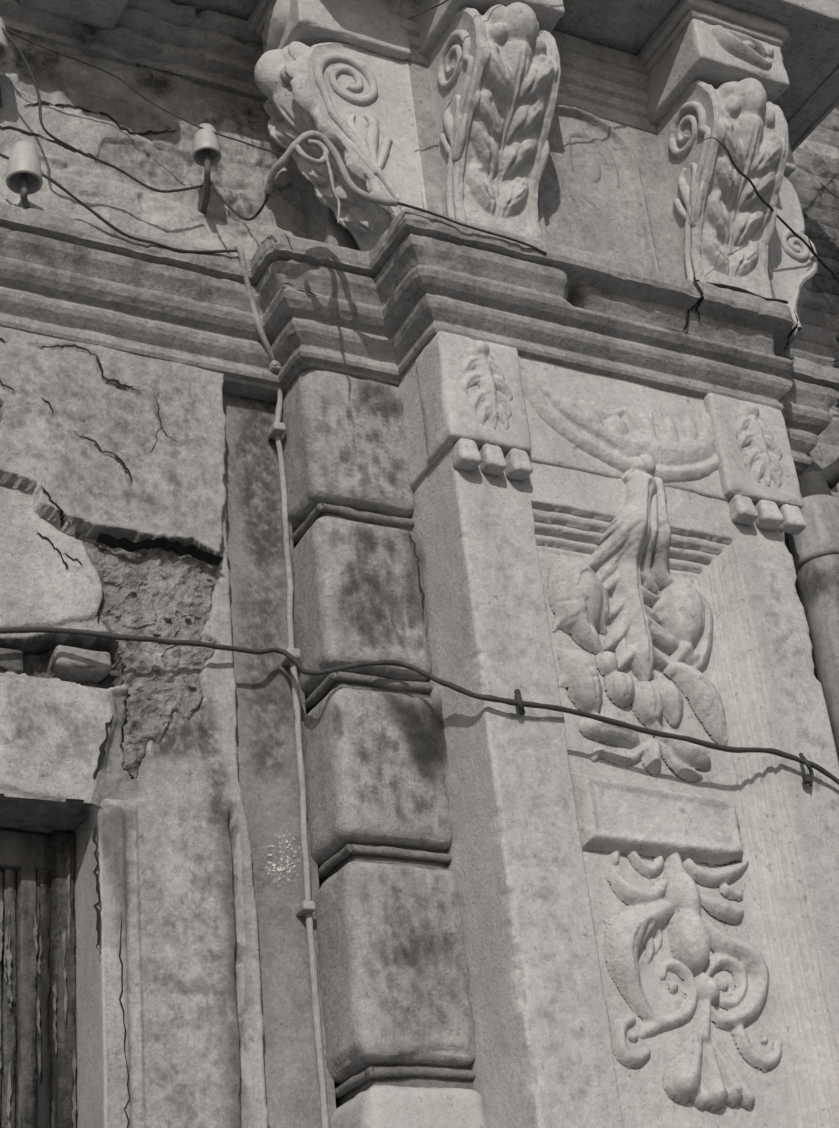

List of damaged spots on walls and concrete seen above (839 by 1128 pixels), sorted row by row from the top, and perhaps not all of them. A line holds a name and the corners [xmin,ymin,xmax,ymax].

crack [0,101,178,158]
crack [682,270,798,363]
crack [0,379,132,482]
crack [36,344,178,452]
spalling [23,534,217,779]
crack [93,716,113,778]
damp [389,694,444,771]
crack [92,816,130,1128]